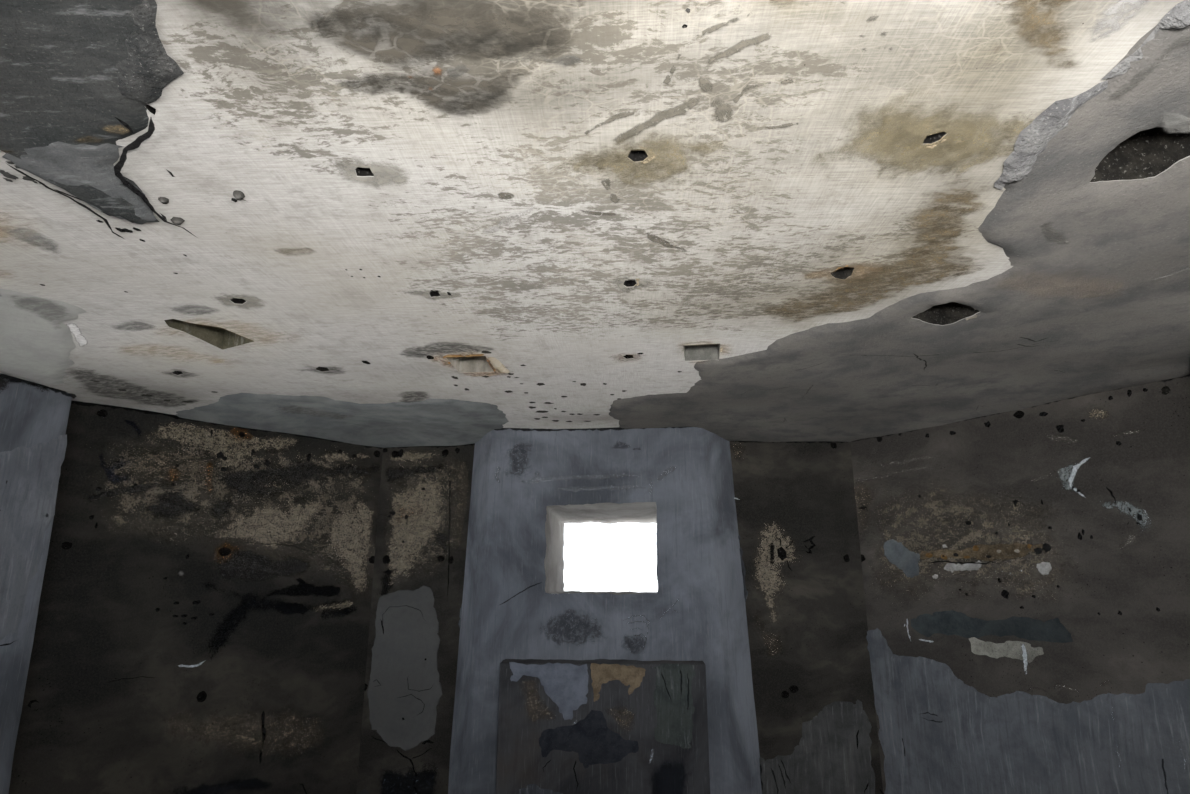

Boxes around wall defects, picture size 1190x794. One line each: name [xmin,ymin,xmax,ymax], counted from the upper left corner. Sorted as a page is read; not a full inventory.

leakage [311,6,579,115]
peeling [709,34,770,63]
leakage [1015,0,1072,65]
peeling [0,161,41,184]
crack [114,117,196,237]
spalling [574,78,757,215]
hole [830,265,854,280]
leakage [767,190,980,322]
peeling [89,422,460,612]
peeling [752,523,801,622]
peeling [859,480,1093,609]
peeling [509,662,646,769]